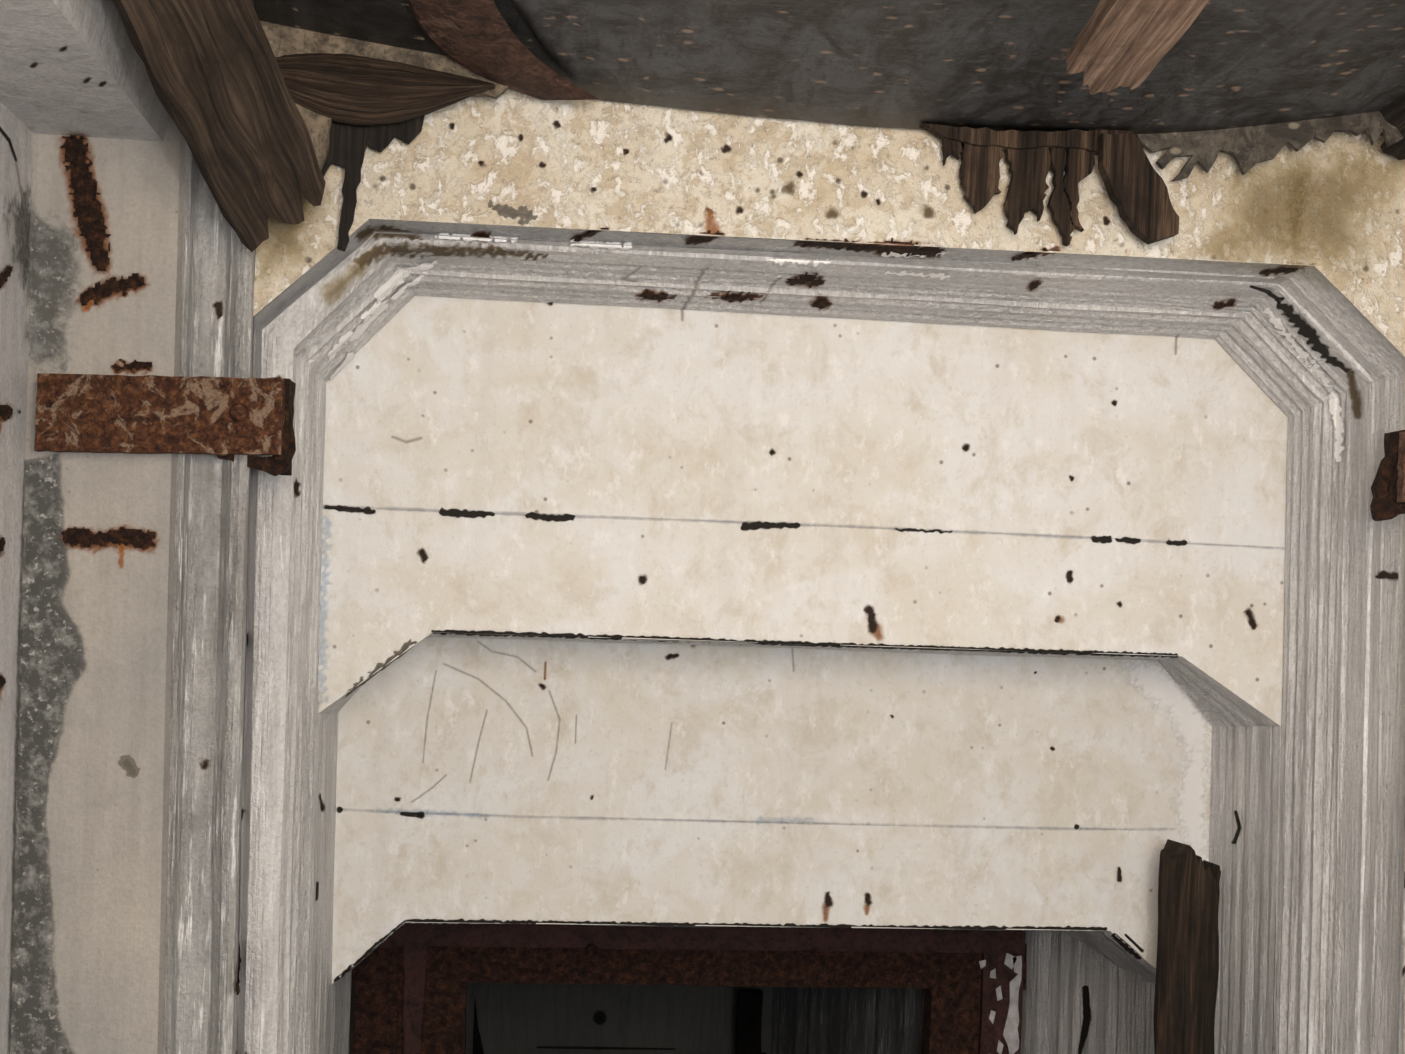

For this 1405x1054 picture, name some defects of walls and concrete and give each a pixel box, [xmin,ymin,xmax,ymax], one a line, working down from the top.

rust [60,134,146,311]
spalling [782,171,803,194]
leakage [1213,159,1393,259]
rust [0,265,13,288]
peeling [979,953,1022,1054]